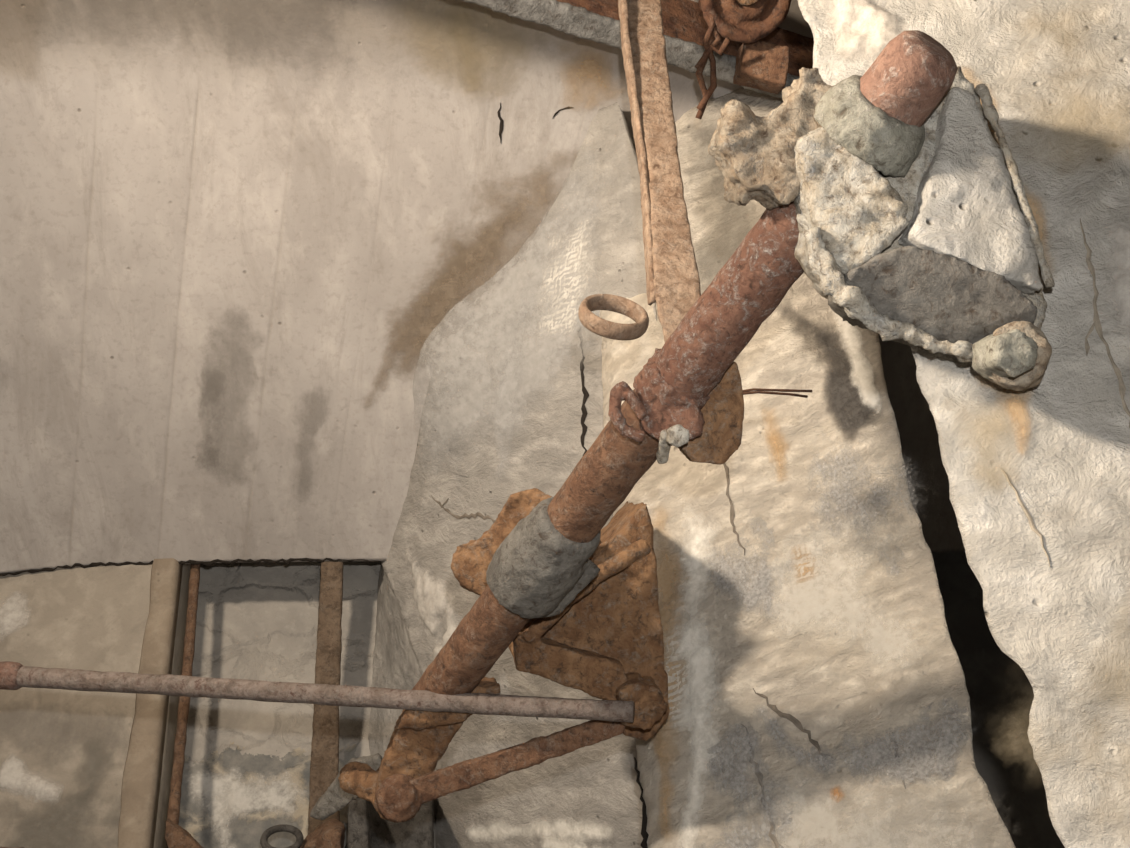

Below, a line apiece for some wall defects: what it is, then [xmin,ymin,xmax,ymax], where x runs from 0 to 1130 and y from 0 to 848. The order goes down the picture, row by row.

crack [496,103,504,142]
damp [379,173,591,452]
crack [1080,219,1130,428]
crack [576,313,589,455]
crack [431,495,496,523]
crack [723,463,745,555]
crack [1001,468,1050,566]
crack [0,558,379,576]
crack [753,688,835,760]
crack [741,724,784,848]